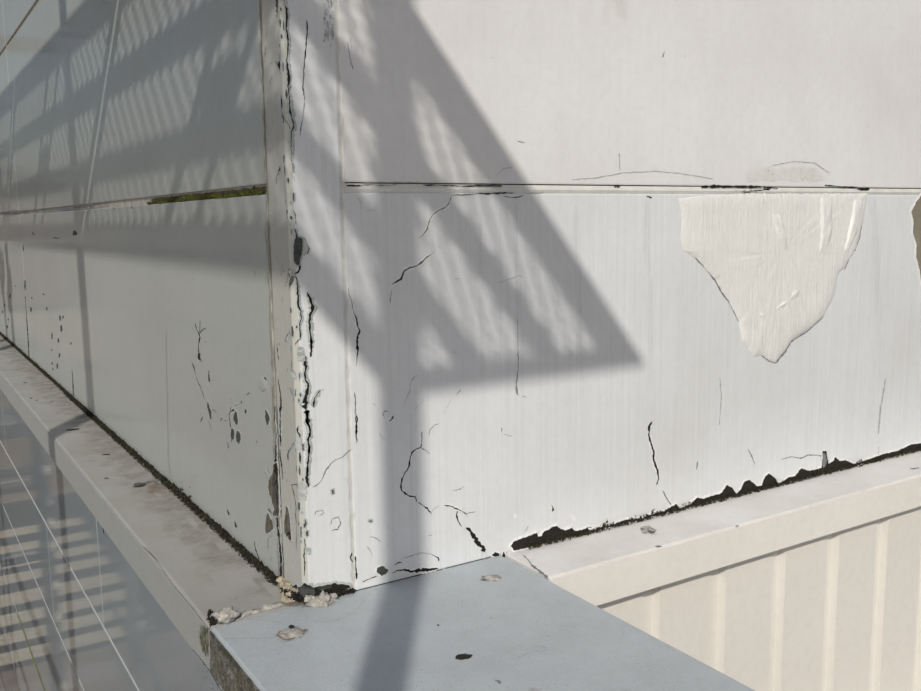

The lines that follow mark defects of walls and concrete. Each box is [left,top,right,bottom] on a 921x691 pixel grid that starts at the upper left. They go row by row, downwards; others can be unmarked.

peeling [275,6,289,73]
crack [259,0,308,226]
crack [390,196,452,300]
peeling [909,193,921,288]
peeling [51,314,64,371]
crack [192,323,250,444]
peeling [230,407,247,447]
peeling [289,305,306,404]
spalling [264,435,341,565]
crack [254,268,376,577]
crack [392,424,486,575]
crack [646,421,671,505]